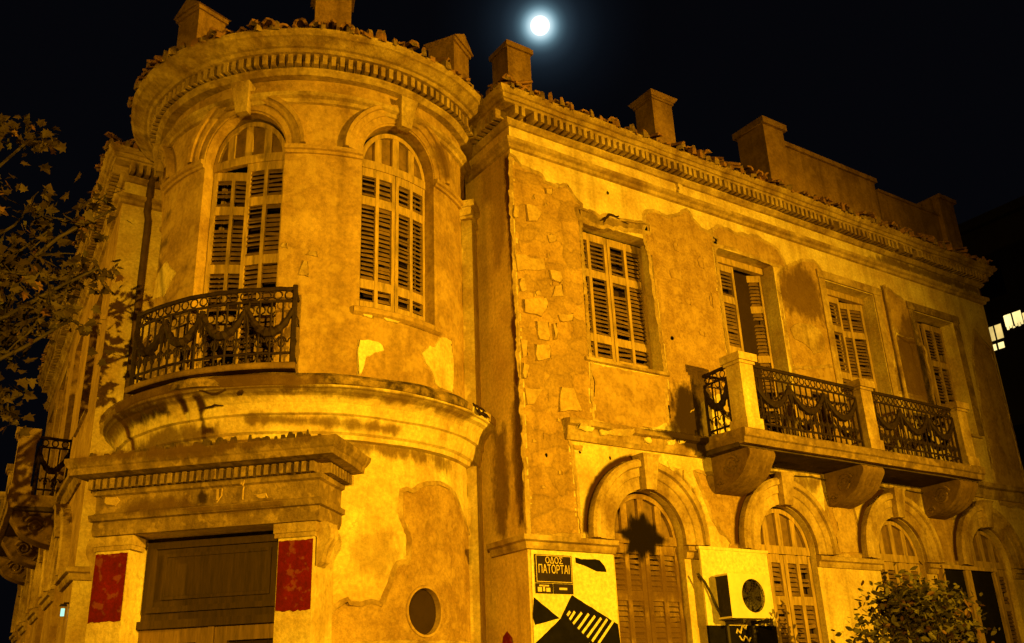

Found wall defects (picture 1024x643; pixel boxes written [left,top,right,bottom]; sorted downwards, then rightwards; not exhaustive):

leakage [78,373,474,463]
flaking render [508,153,846,549]
leakage [781,264,823,320]
flaking render [331,481,472,643]